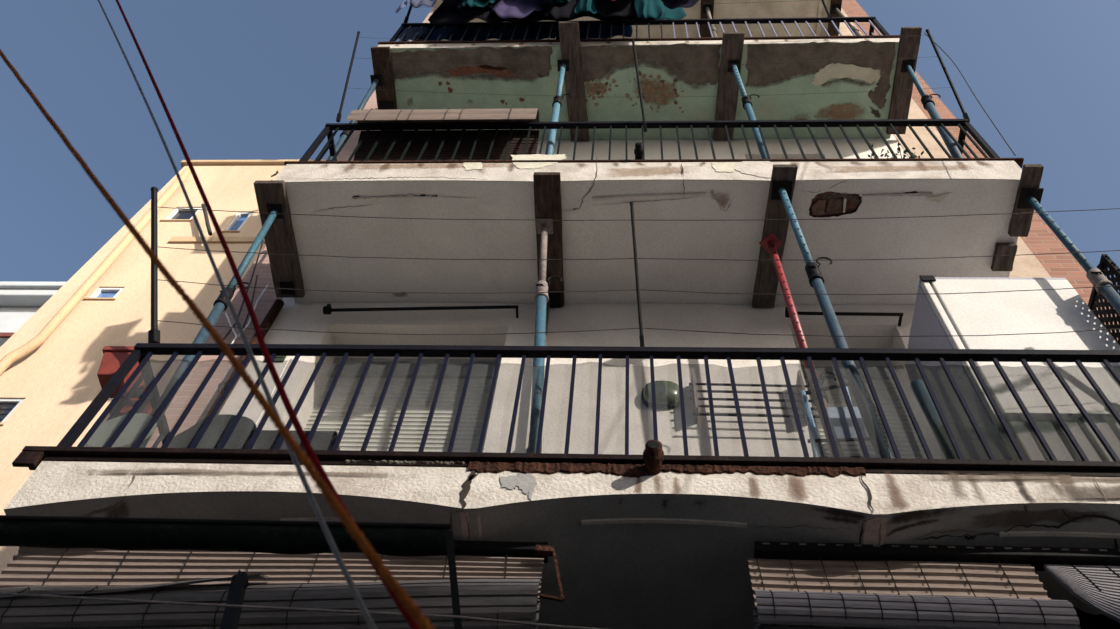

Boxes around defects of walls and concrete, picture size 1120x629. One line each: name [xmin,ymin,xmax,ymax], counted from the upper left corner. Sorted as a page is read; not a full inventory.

peeling [391,45,553,93]
peeling [745,40,896,108]
rust [820,103,862,120]
crack [565,159,735,211]
spalling [809,191,862,218]
crack [450,470,478,541]
peeling [500,473,537,500]
rust [345,459,866,508]
crack [749,474,881,546]
crack [914,478,1120,548]